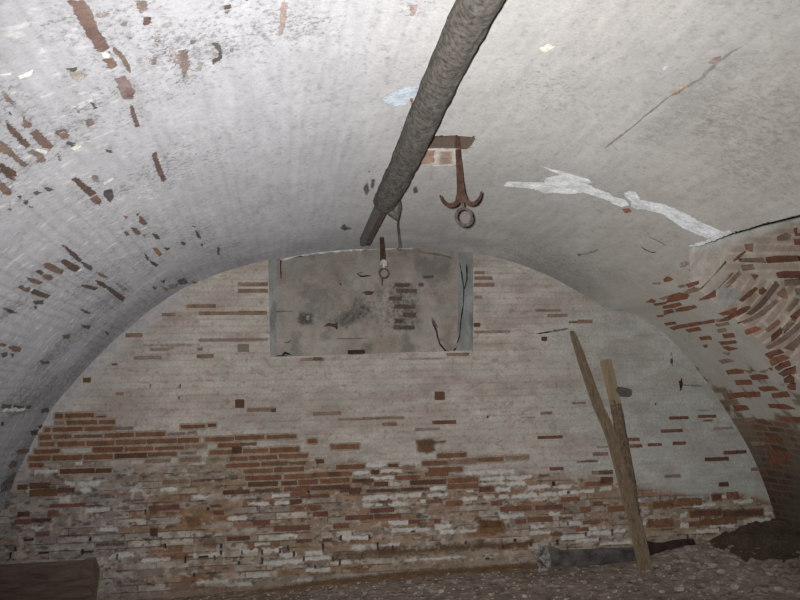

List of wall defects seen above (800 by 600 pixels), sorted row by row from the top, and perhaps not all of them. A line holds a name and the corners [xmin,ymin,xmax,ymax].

flaking render [67,0,139,127]
peeling [152,32,234,84]
crack [605,46,742,148]
flaking render [0,91,82,207]
flaking render [71,175,114,205]
flaking render [17,245,127,309]
crack [279,248,468,351]
flaking render [647,243,800,445]
peeling [0,404,625,537]
damp [256,564,538,591]
damp [332,542,529,560]
peeling [646,482,764,528]